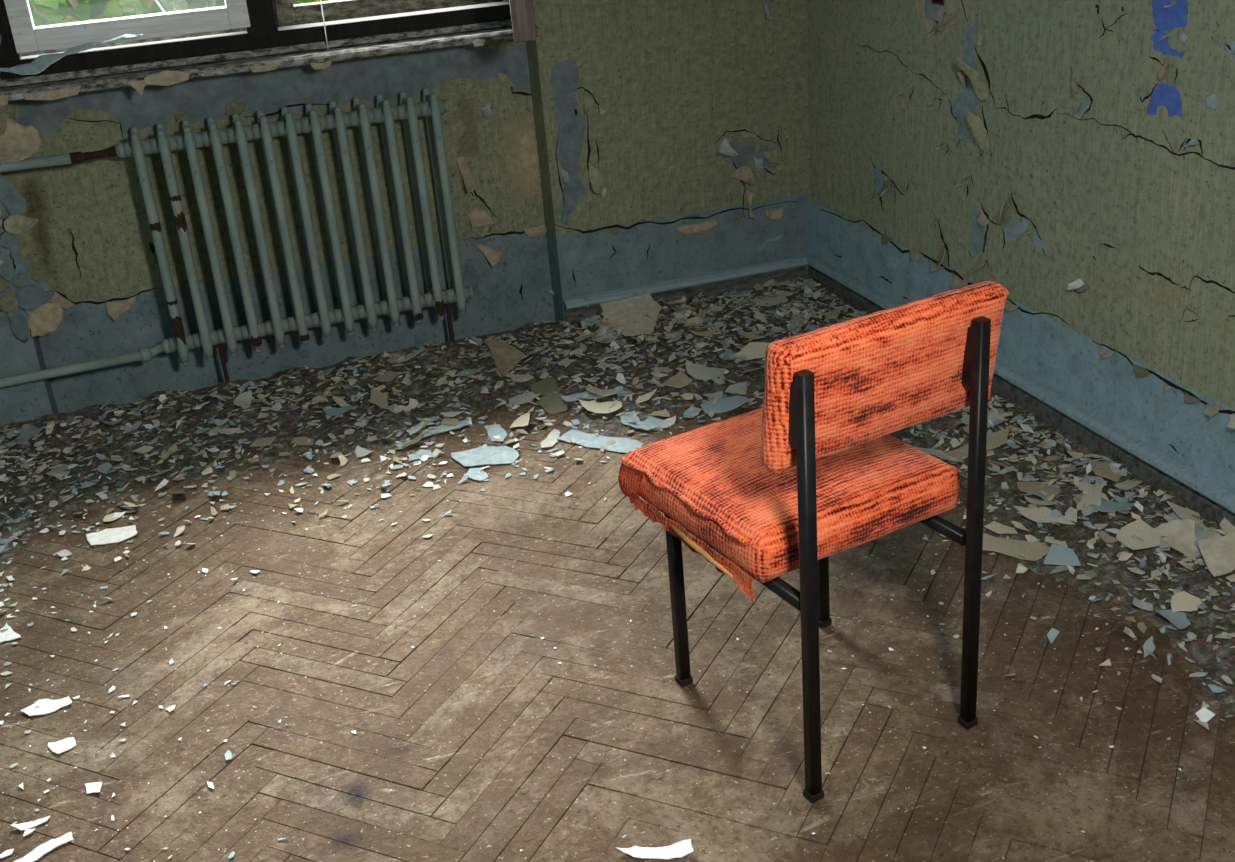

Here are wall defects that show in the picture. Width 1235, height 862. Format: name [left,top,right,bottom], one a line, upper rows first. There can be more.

peeling [898,0,995,159]
peeling [1135,0,1188,119]
crack [994,95,1235,170]
peeling [0,34,531,343]
crack [932,217,950,270]
peeling [954,174,1045,277]
crack [1139,266,1235,322]